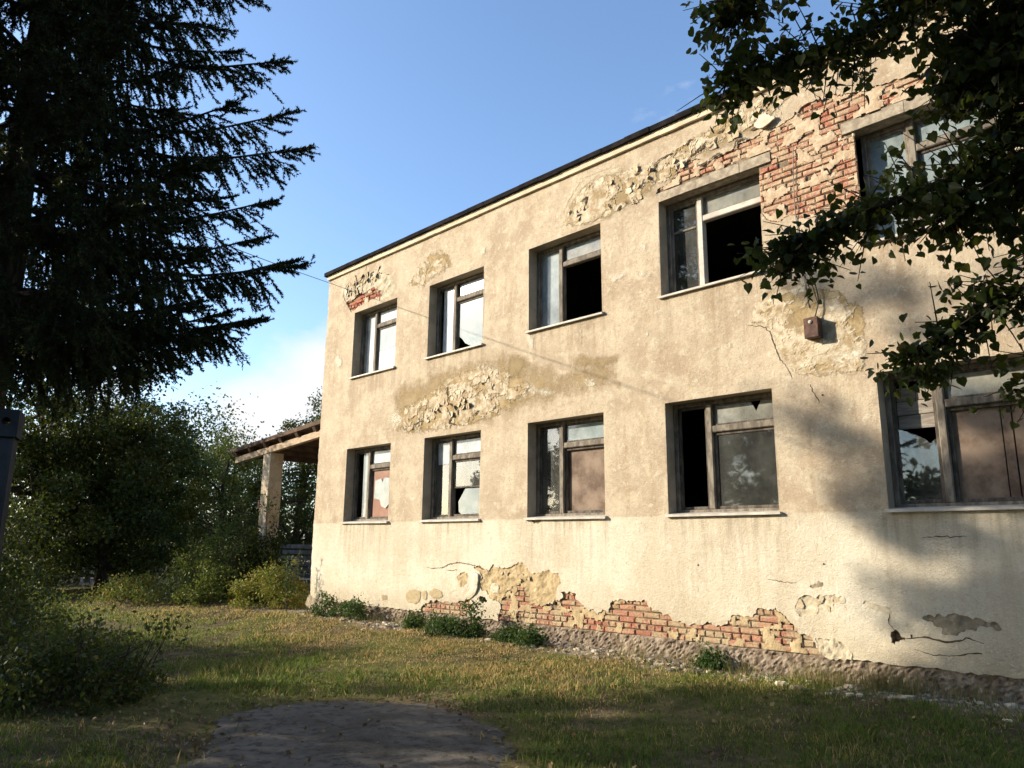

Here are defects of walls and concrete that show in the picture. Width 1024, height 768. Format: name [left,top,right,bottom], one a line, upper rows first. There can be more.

flaking render [563,75,942,227]
spalling [344,266,395,312]
flaking render [748,282,867,378]
flaking render [395,362,531,434]
flaking render [405,562,852,661]
crack [888,614,984,657]
spalling [922,613,1002,636]